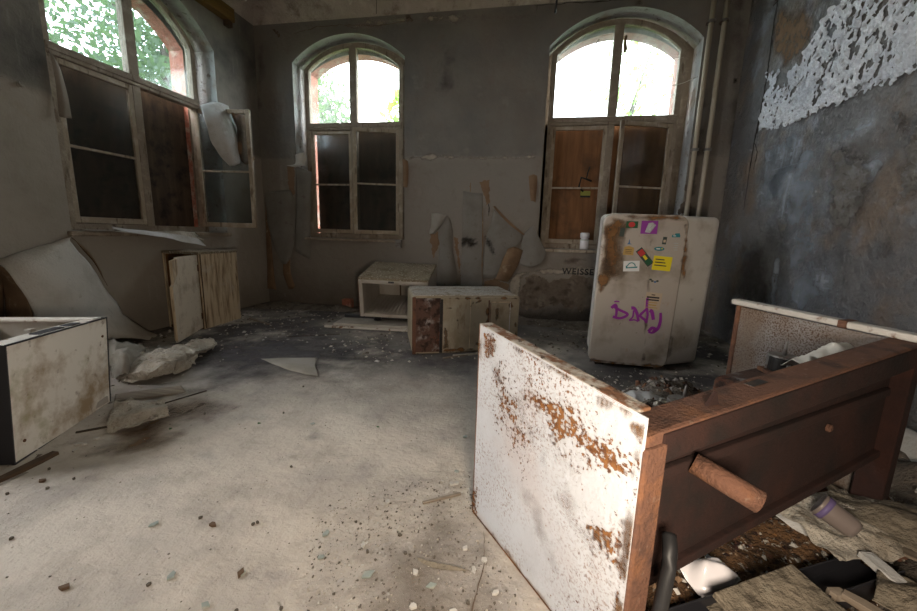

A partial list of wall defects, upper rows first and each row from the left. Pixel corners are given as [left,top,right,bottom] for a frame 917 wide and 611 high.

peeling [758,0,917,131]